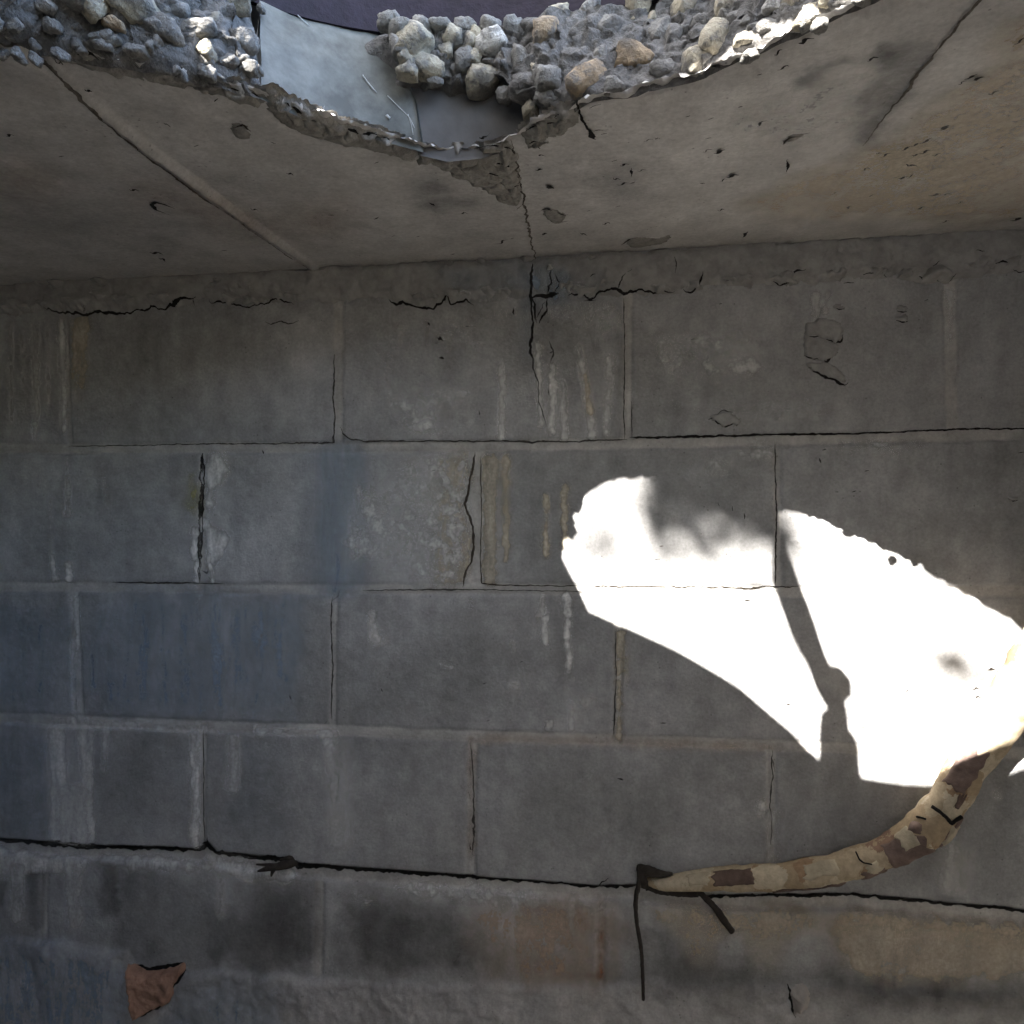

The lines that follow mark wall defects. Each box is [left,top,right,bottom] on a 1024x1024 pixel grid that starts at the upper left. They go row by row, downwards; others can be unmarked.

spalling [0,0,880,207]
crack [45,141,1024,735]
water stain [535,343,568,441]
spalling [803,318,848,386]
water stain [190,455,228,583]
crack [707,892,1024,913]